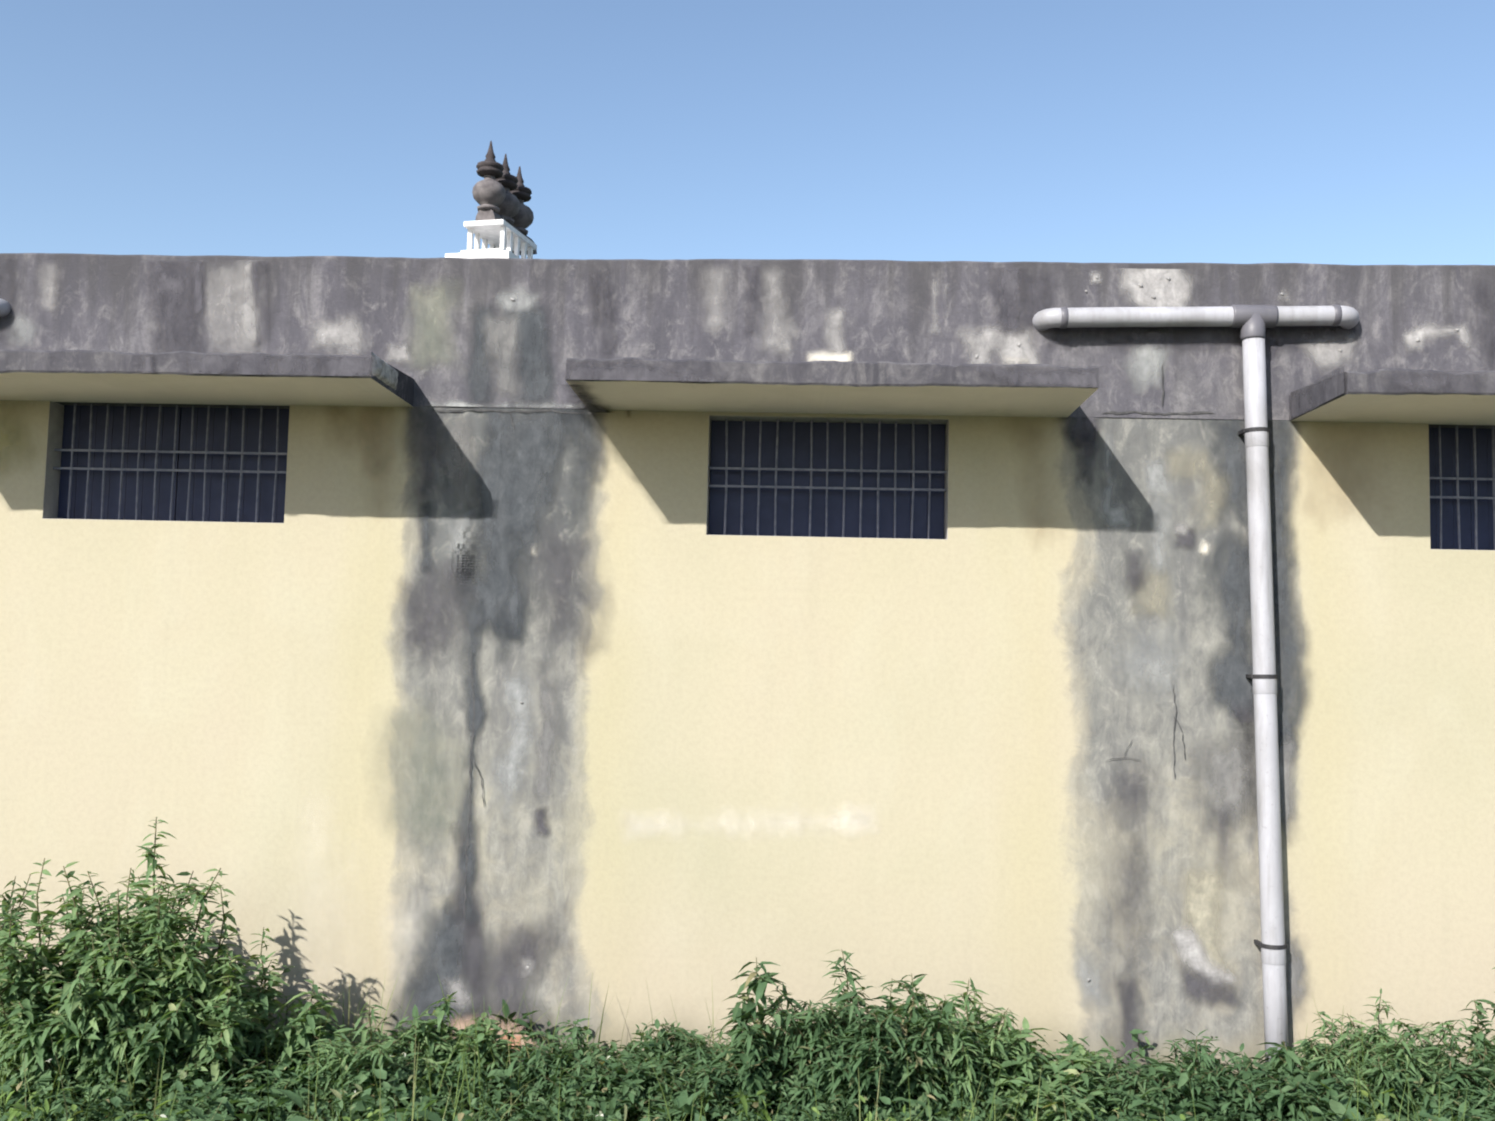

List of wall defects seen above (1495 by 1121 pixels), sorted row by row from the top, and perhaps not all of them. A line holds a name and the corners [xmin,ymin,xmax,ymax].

leakage [192,260,259,344]
leakage [485,309,573,408]
leakage [809,310,851,361]
leakage [1028,278,1047,315]
leakage [1052,327,1239,346]
leakage [1265,326,1353,350]
leakage [440,402,482,500]
leakage [421,504,431,571]
leakage [466,608,485,764]
leakage [1198,713,1253,827]
leakage [1279,741,1295,829]
leakage [458,786,540,1030]